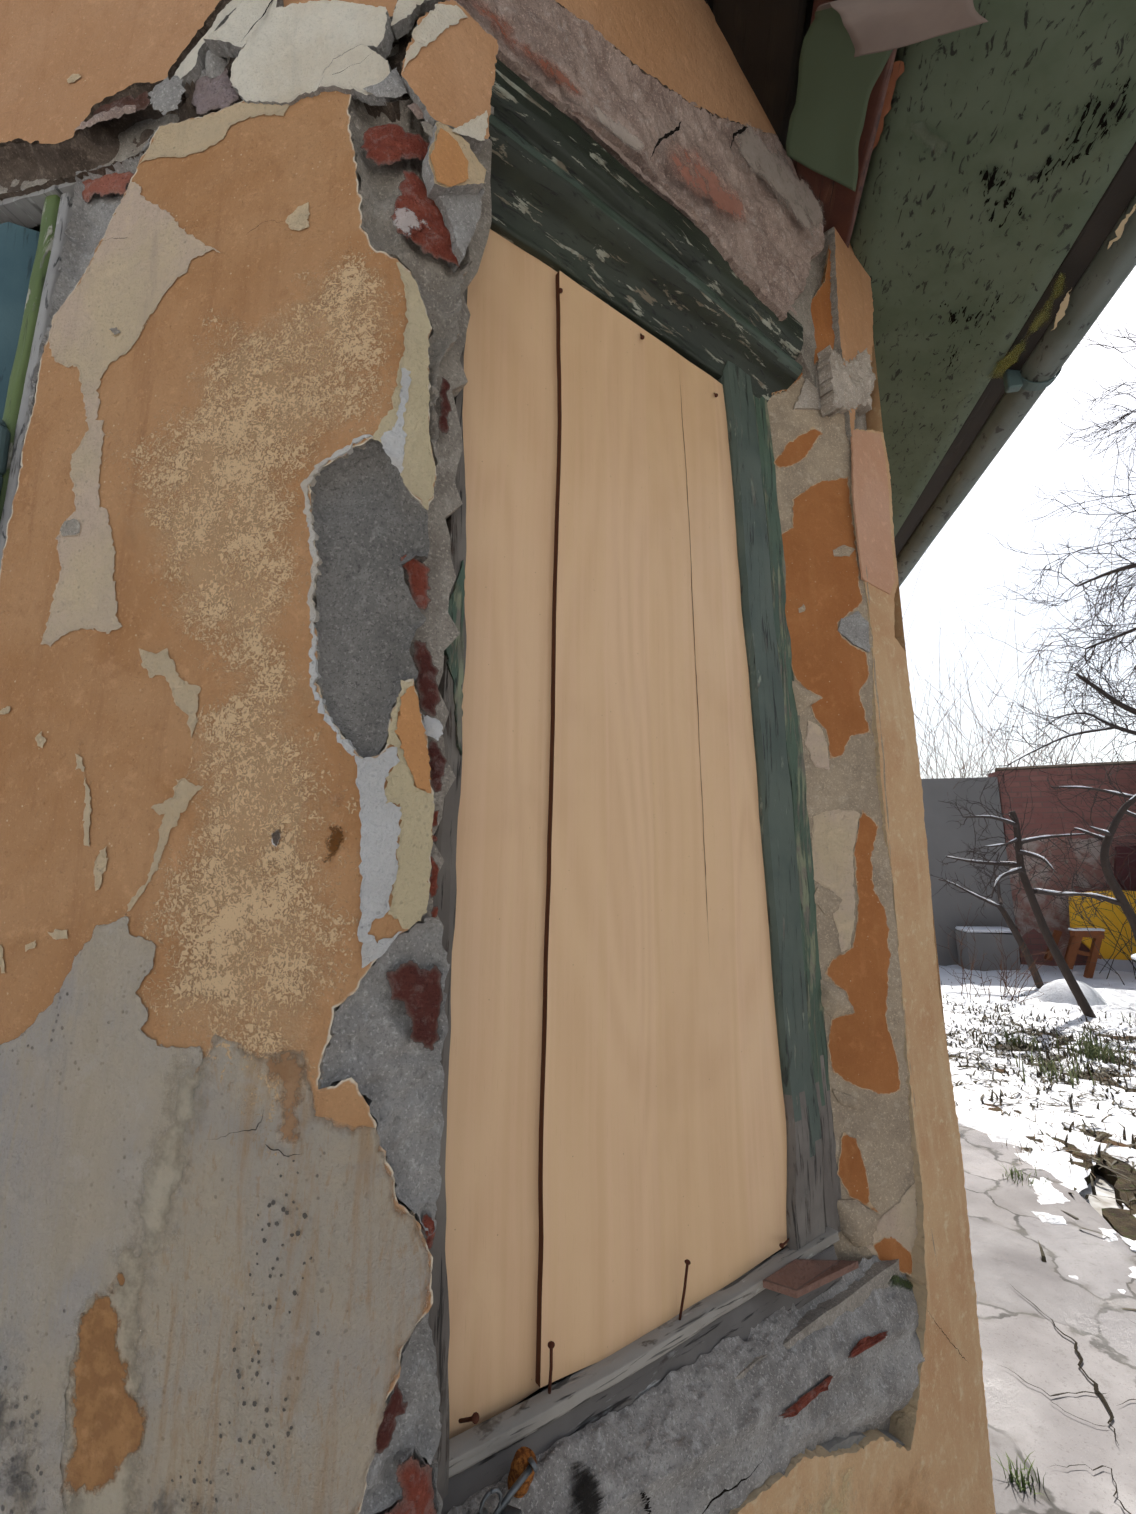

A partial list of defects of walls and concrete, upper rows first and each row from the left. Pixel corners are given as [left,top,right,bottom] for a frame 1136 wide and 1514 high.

peeling [782,477,871,770]
peeling [0,0,833,1514]
peeling [812,809,901,1111]
peeling [837,1132,918,1277]
spalling [818,1429,905,1453]
flaking render [848,1330,889,1358]
crack [1000,1281,1136,1514]